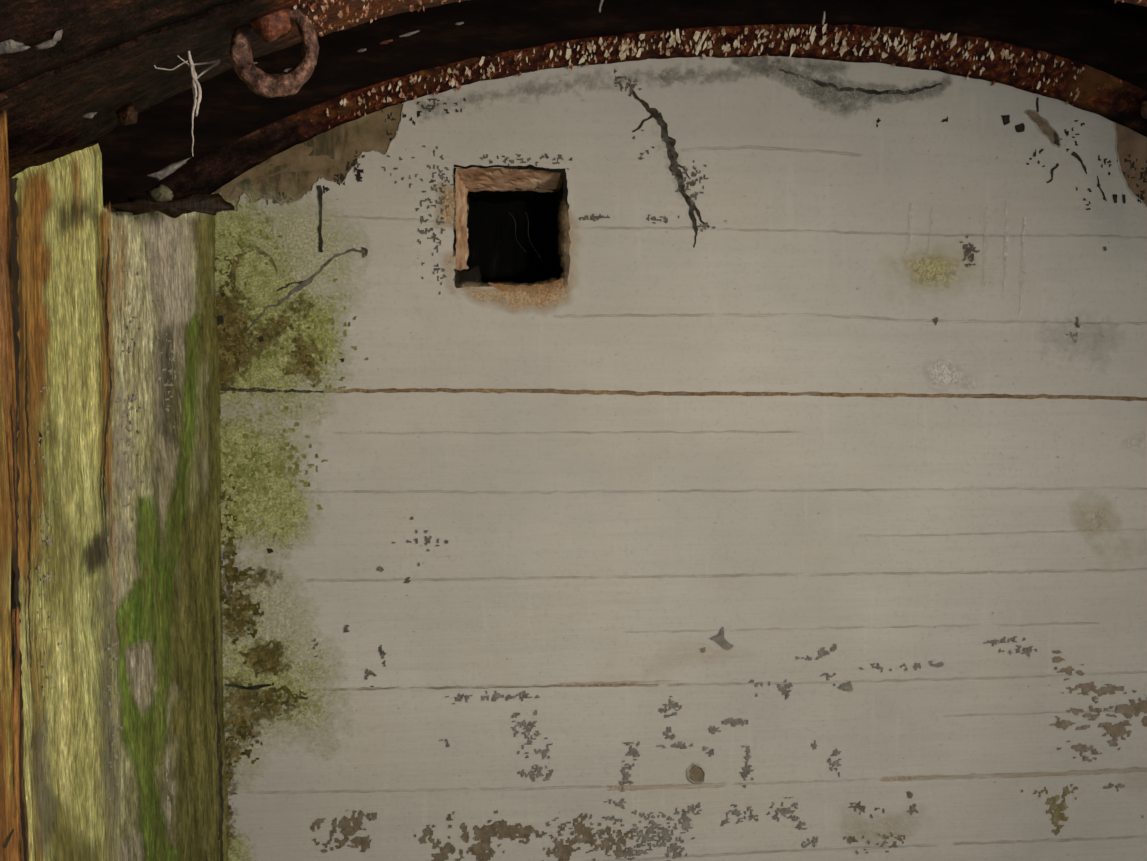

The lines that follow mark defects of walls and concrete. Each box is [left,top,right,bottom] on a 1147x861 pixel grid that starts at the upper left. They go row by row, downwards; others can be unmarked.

peeling [440,56,504,87]
water stain [614,69,642,96]
peeling [550,24,1064,148]
flaking render [212,75,466,211]
crack [628,83,710,247]
water stain [672,160,709,205]
flaking render [1113,122,1147,210]
peeling [414,741,702,861]
peeling [657,696,714,784]
peeling [709,717,748,734]
peeling [740,746,754,788]
peeling [1050,650,1147,762]